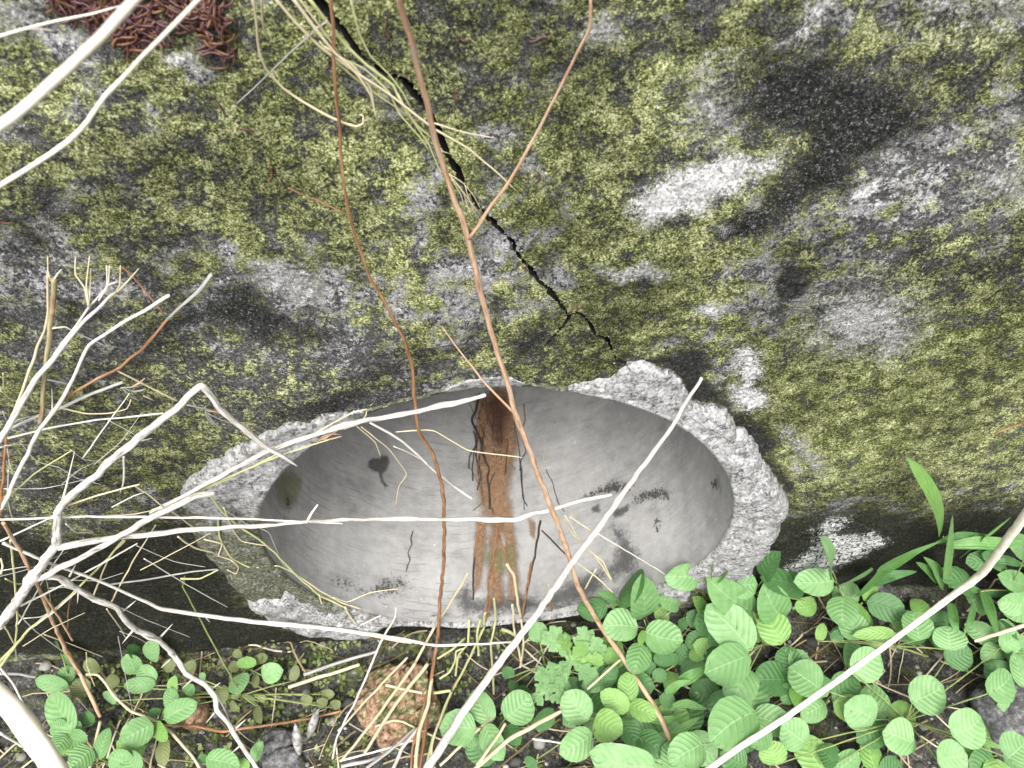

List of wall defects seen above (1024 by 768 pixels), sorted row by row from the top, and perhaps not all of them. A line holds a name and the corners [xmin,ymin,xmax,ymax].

crack [304,0,627,364]
corrosion [474,389,519,603]